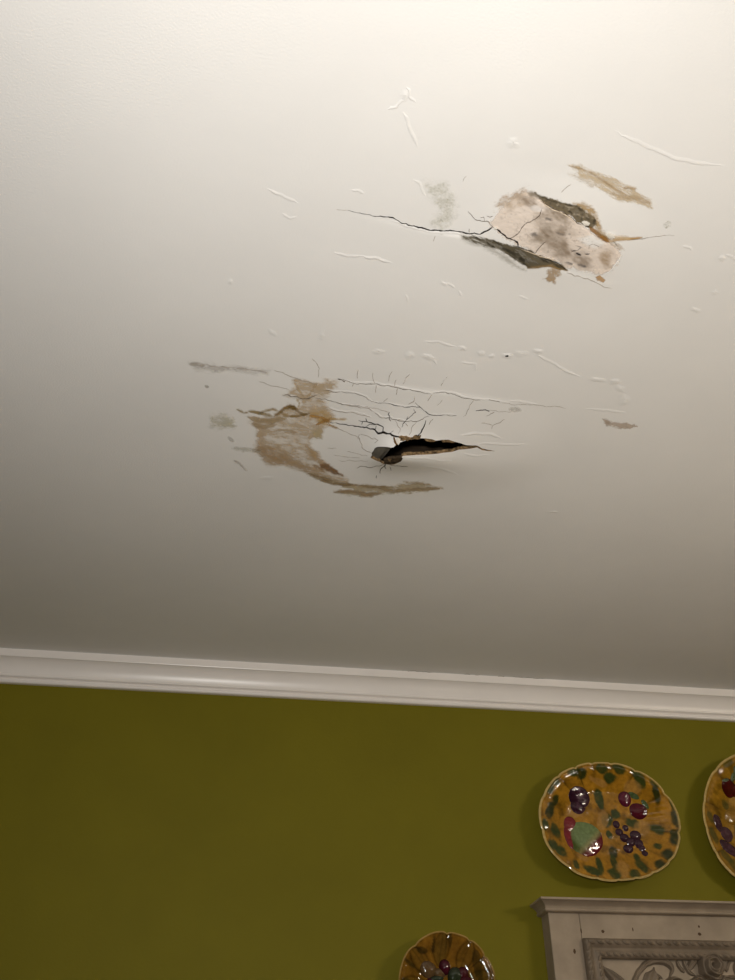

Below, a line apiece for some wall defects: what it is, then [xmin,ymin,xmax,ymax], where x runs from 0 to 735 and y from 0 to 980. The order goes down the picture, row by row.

crack [348,210,492,241]
spalling [462,191,642,276]
water stain [231,379,439,497]
crack [203,360,562,477]